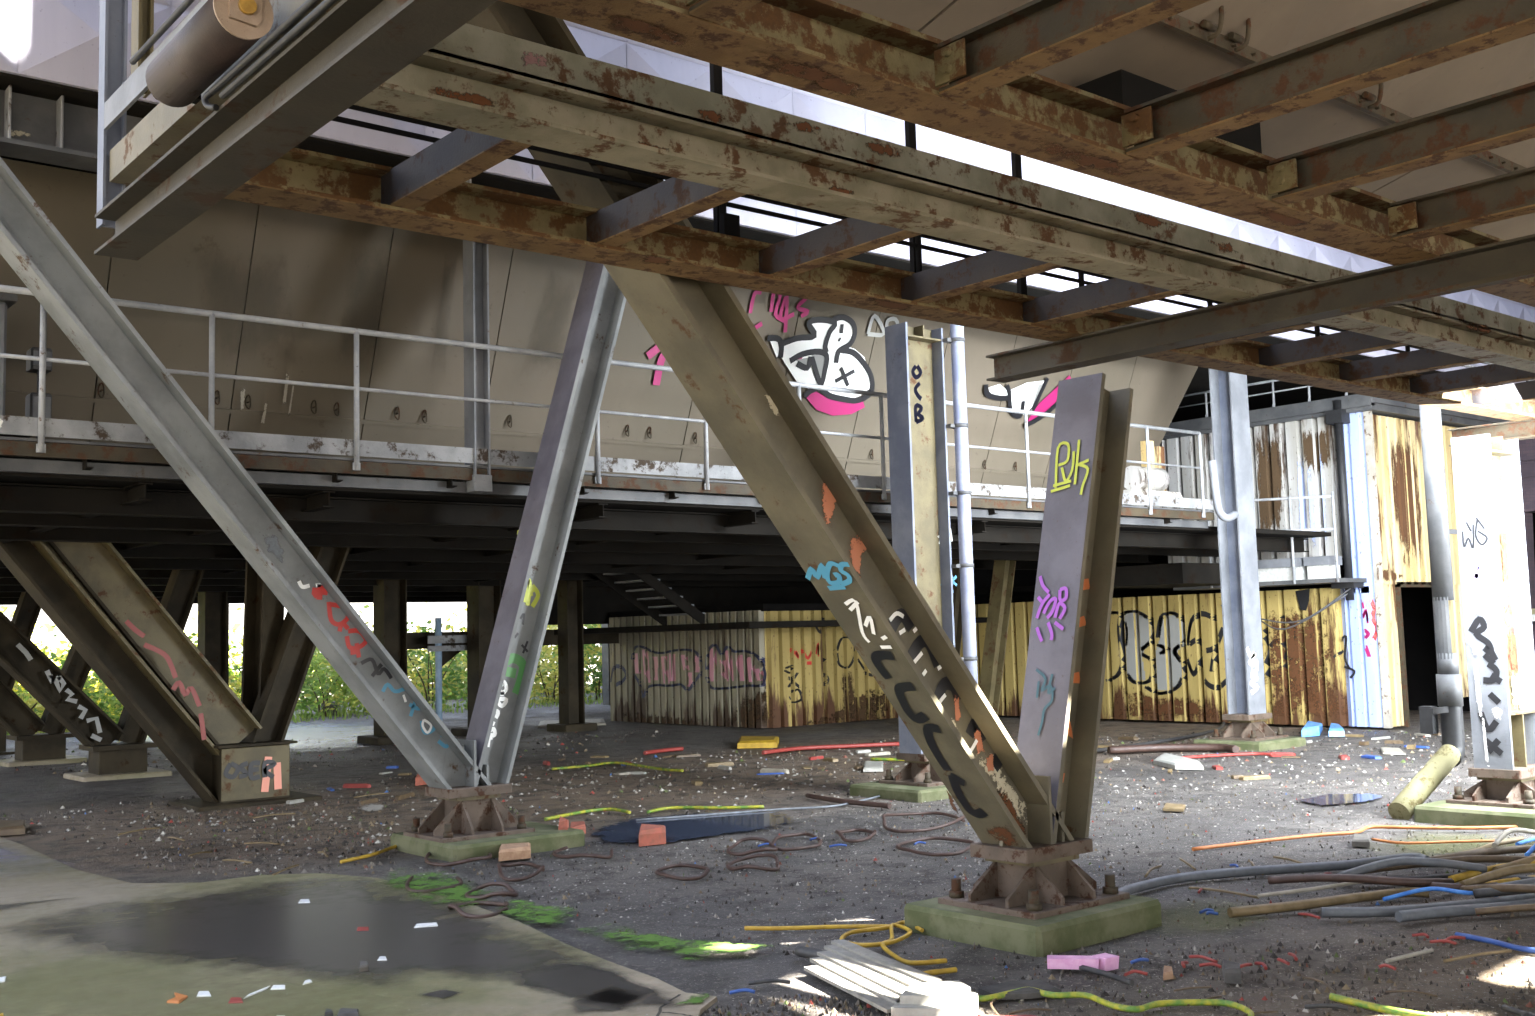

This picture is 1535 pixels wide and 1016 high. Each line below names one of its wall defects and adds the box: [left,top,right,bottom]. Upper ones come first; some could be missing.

rust [756,56,860,97]
rust [435,87,495,107]
rust [786,121,821,134]
rust [866,141,910,157]
rust [1132,211,1167,228]
rust [1208,240,1235,253]
rust [1377,440,1422,581]
rust [1262,612,1348,718]
rust [1114,686,1221,720]